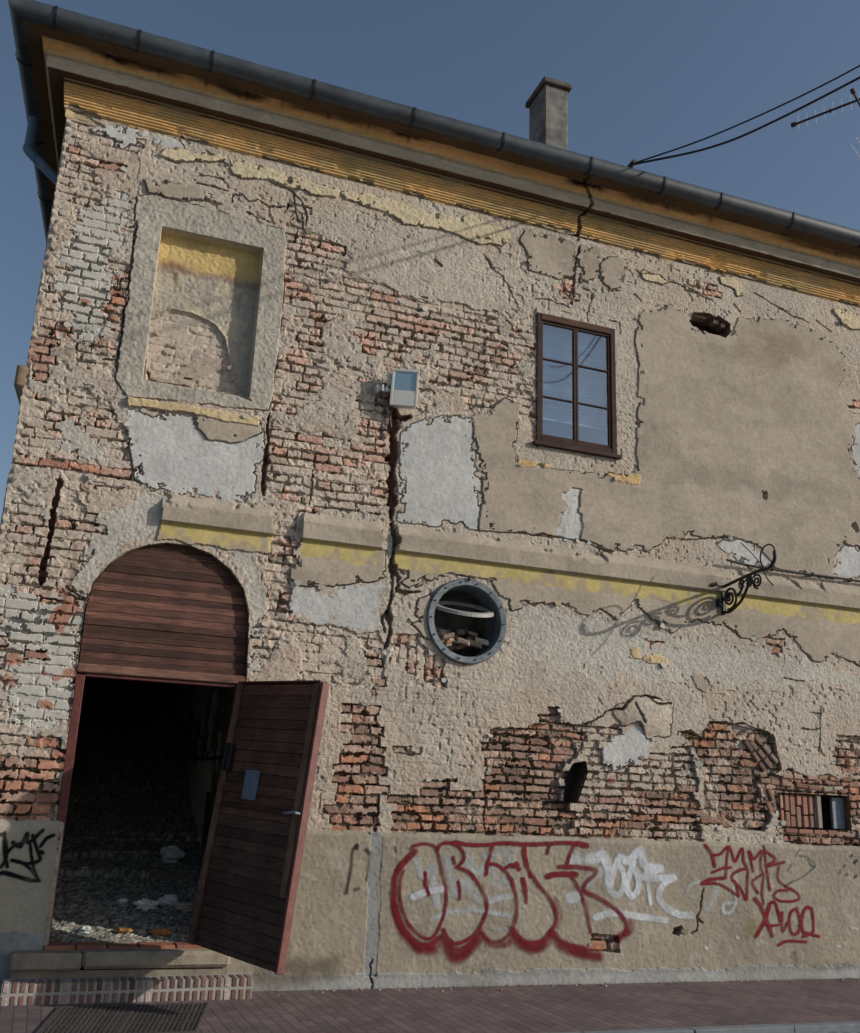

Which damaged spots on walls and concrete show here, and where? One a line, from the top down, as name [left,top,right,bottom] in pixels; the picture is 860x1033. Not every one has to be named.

spalling [28,317,74,383]
flaking render [147,309,242,392]
flaking render [67,125,633,308]
spalling [345,291,509,384]
crack [484,175,622,335]
crack [633,269,832,332]
flaking render [12,408,265,502]
flaking render [397,305,860,577]
spalling [1,511,109,559]
crack [37,477,86,601]
crack [380,399,421,650]
spalling [157,519,860,847]